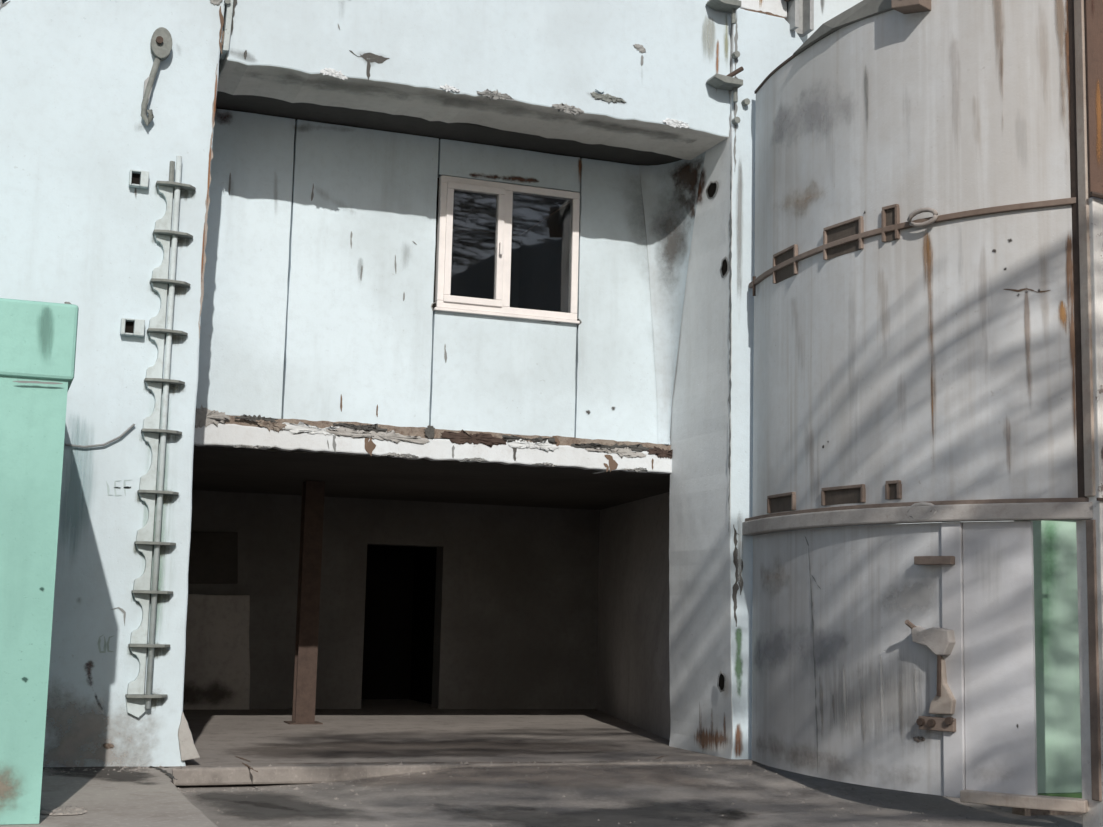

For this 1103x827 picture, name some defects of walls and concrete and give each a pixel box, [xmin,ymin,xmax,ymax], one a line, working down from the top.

spalling [477,89,515,101]
spalling [552,103,584,116]
spalling [590,89,626,103]
spalling [663,118,689,129]
corrosion [923,233,933,300]
corrosion [1059,237,1076,433]
spalling [195,405,673,472]
peeling [732,525,743,627]